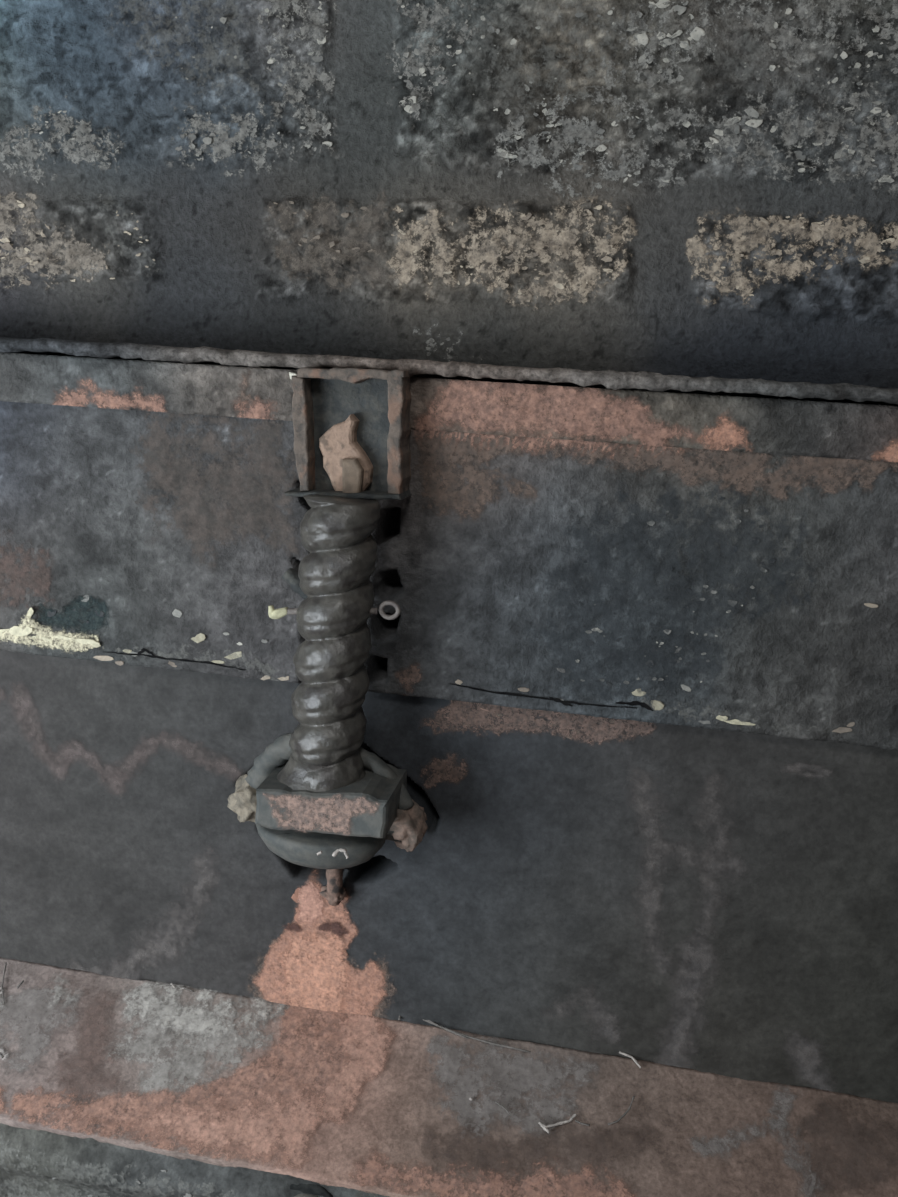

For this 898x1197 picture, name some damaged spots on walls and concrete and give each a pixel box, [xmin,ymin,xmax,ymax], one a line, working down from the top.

rust [53,379,165,412]
rust [235,371,270,419]
rust [415,380,898,518]
peeling [211,632,243,664]
crack [448,683,654,711]
rust [0,870,396,1168]
rust [349,1152,635,1197]